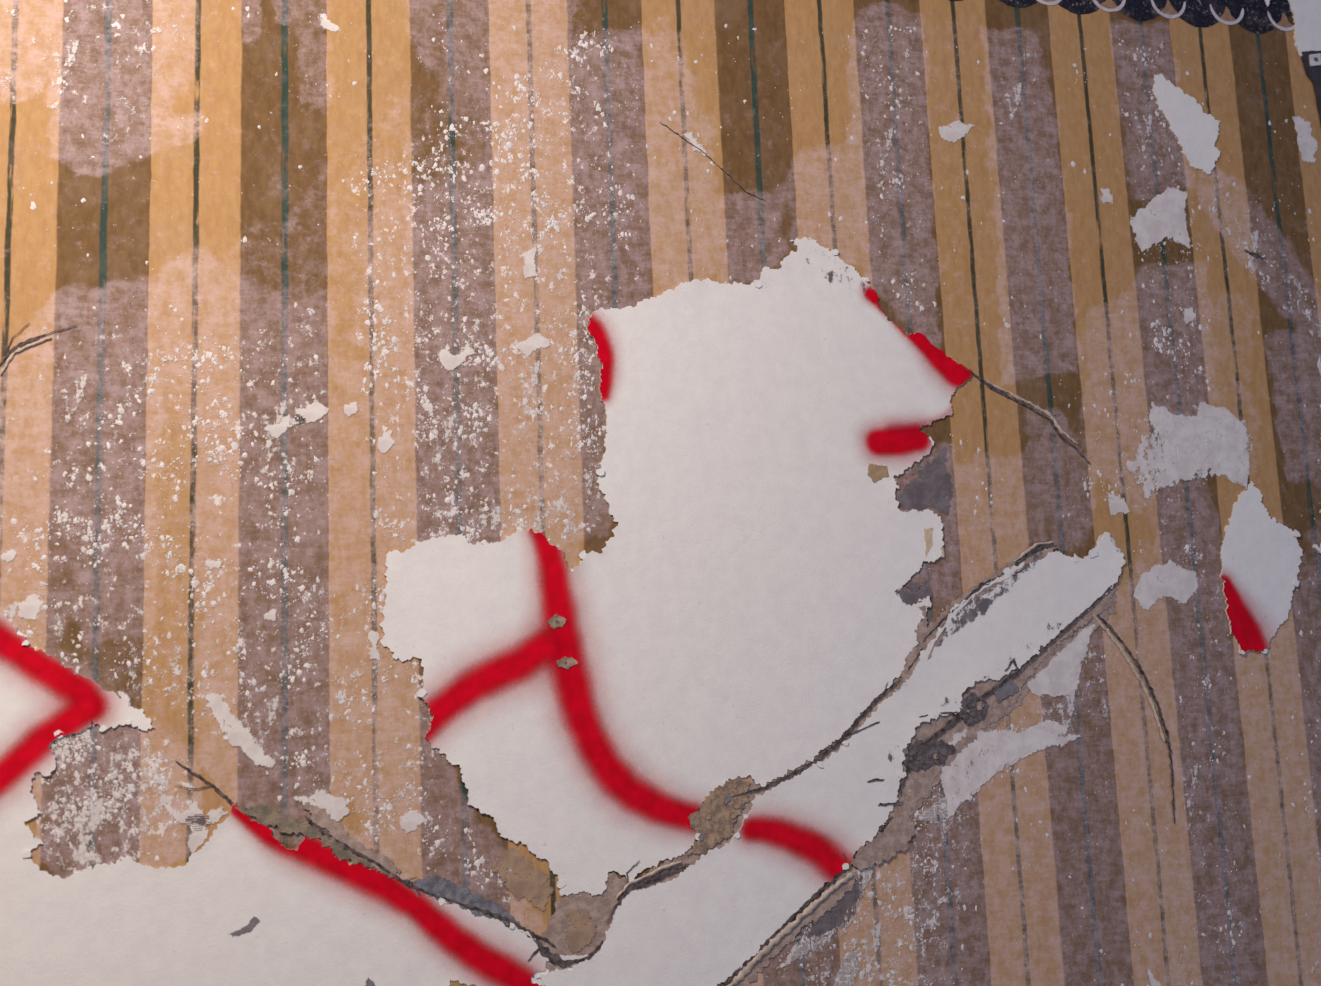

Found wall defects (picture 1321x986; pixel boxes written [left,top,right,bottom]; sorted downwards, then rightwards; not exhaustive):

peeling [1288,0,1321,57]
peeling [1152,74,1220,175]
crack [0,323,77,375]
crack [964,366,1091,465]
peeling [0,236,1126,986]
crack [731,541,1057,798]
peeling [1220,481,1321,655]
crack [175,760,248,810]
crack [723,583,1175,986]
crack [305,816,690,968]